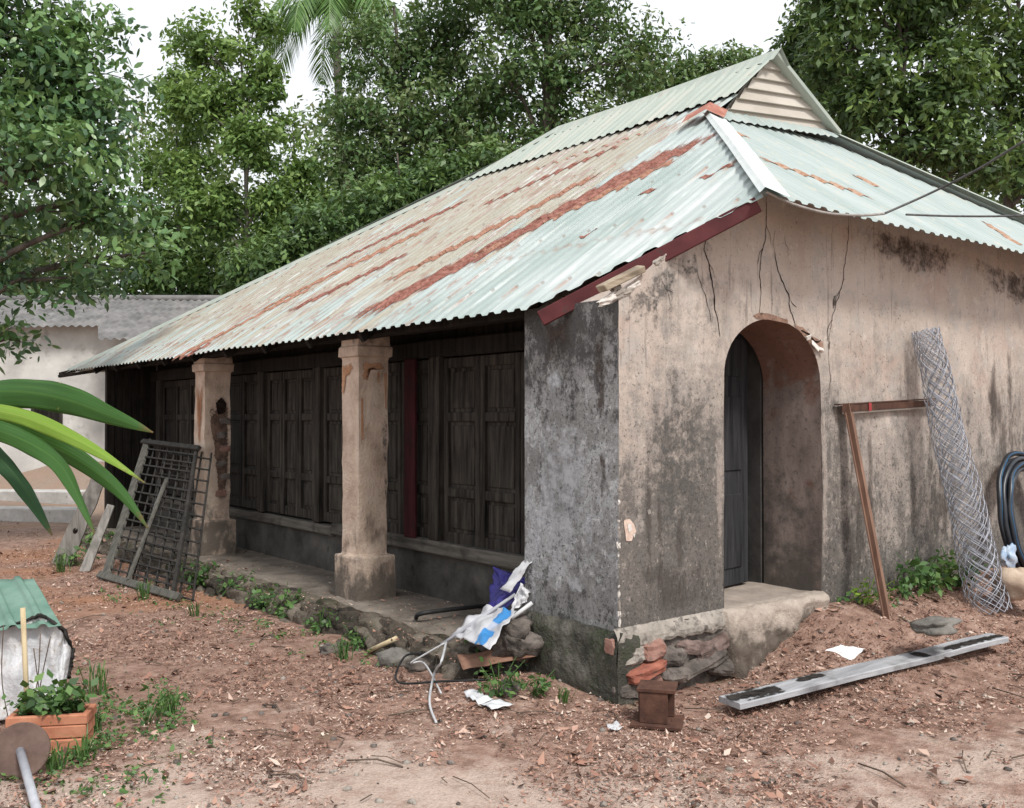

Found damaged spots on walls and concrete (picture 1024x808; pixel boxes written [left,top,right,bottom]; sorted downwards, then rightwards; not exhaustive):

corrosion [763,157,878,199]
peeling [341,362,387,409]
corrosion [173,133,715,360]
water stain [595,336,604,413]
crack [697,241,720,334]
crack [757,201,796,322]
spalling [753,313,824,352]
crack [827,216,849,387]
water stain [877,234,949,271]
spalling [210,398,231,498]
water stain [536,427,584,549]
spalling [616,519,636,569]